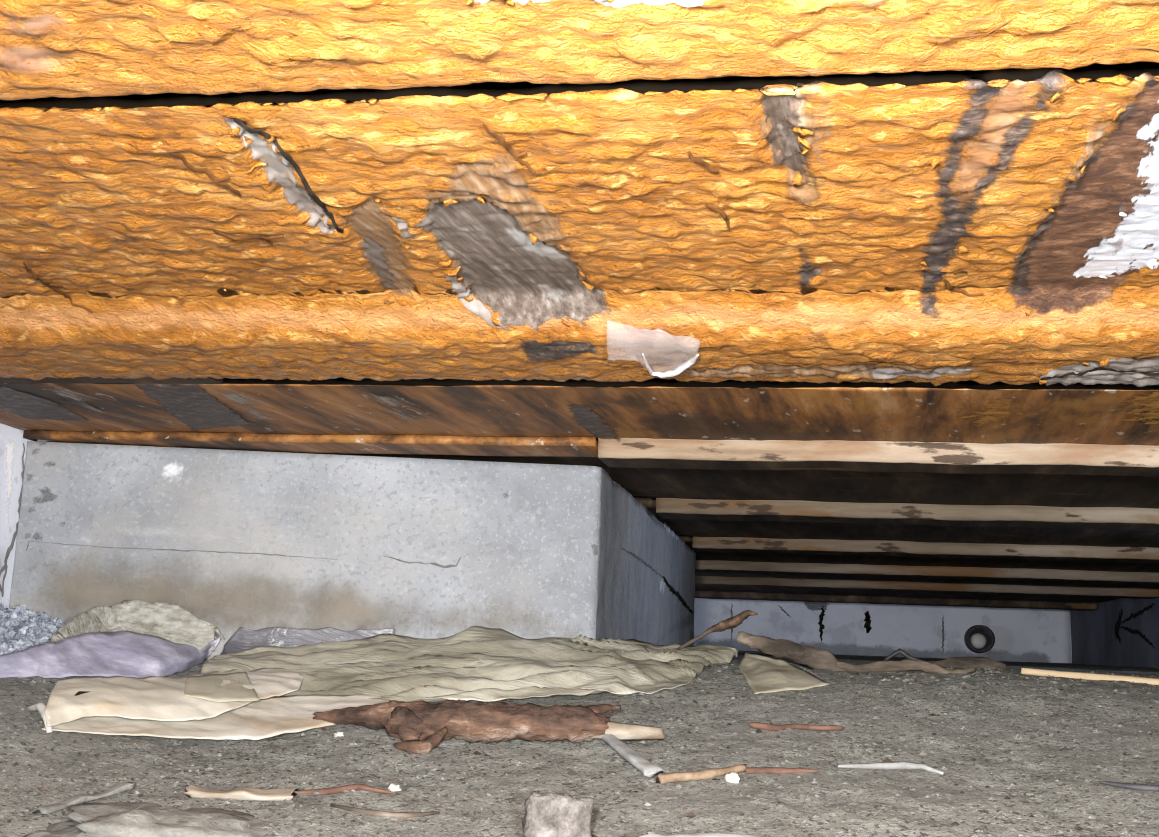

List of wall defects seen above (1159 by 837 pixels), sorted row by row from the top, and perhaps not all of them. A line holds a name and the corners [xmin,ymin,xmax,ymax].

peeling [588,0,703,8]
crack [934,16,1017,38]
peeling [225,118,612,361]
peeling [759,83,830,202]
damp [920,69,1064,317]
peeling [1073,100,1159,279]
peeling [612,330,1019,379]
peeling [1039,357,1159,387]
crack [0,443,338,597]
crack [622,548,693,613]